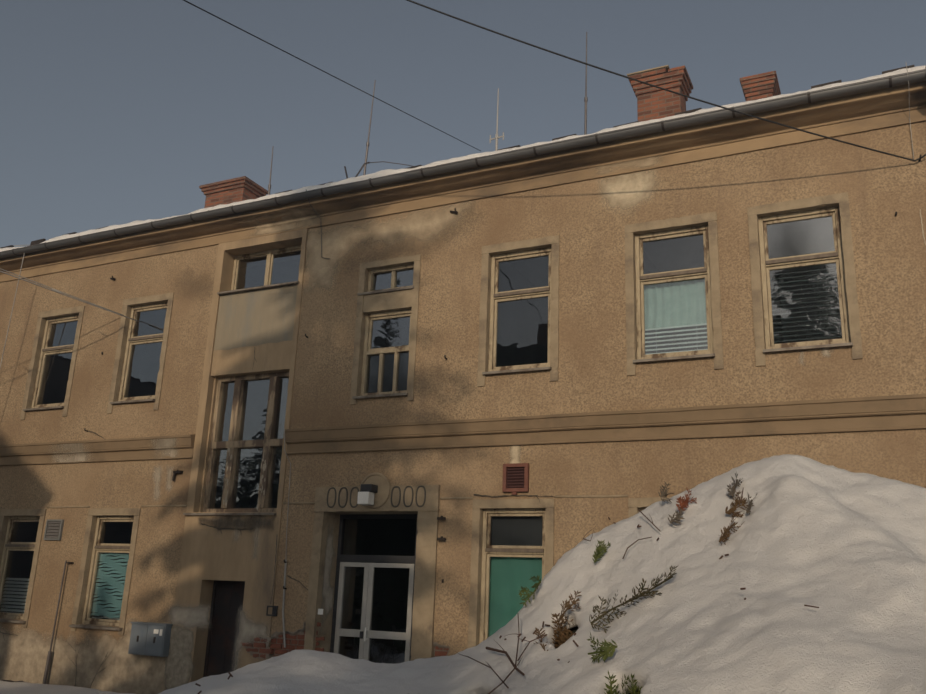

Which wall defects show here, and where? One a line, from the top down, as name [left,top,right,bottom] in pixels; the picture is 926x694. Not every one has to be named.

flaking render [242,622,306,659]